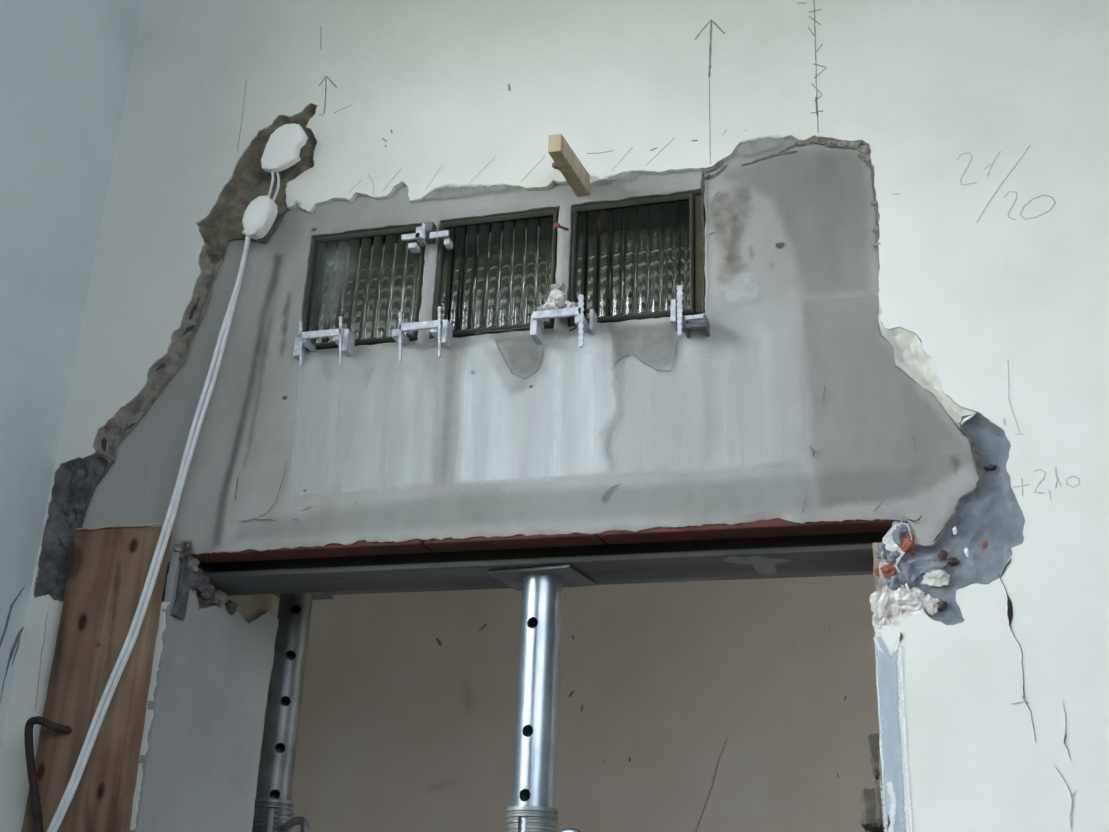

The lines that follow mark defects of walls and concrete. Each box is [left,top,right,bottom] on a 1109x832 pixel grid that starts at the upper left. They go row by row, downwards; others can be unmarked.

spalling [704,160,727,180]
spalling [741,136,881,249]
spalling [34,235,223,602]
water stain [468,337,543,480]
spalling [161,555,191,620]
spalling [860,304,1025,832]
crack [998,558,1036,743]
crack [1056,701,1076,830]